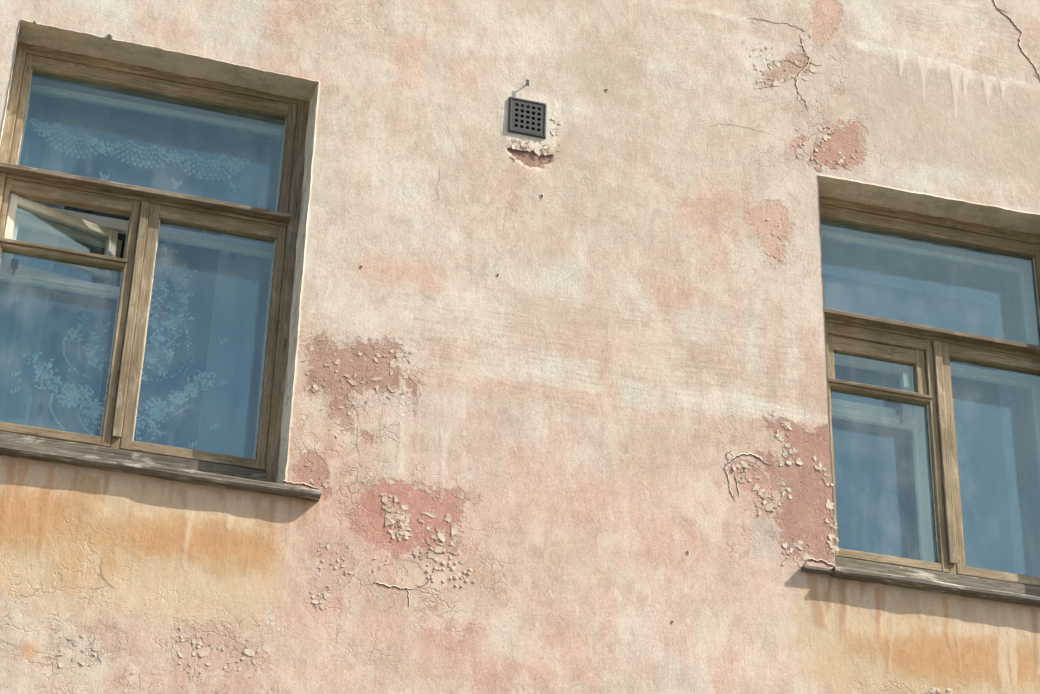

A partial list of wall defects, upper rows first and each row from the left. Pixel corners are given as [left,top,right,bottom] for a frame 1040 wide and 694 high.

flaking render [507,139,552,168]
crack [752,18,818,107]
peeling [743,0,848,94]
peeling [784,123,862,176]
water stain [817,33,1040,207]
crack [993,0,1040,80]
peeling [297,325,426,451]
rust [0,455,305,641]
peeling [288,444,476,614]
peeling [719,406,840,567]
rust [777,558,1040,694]